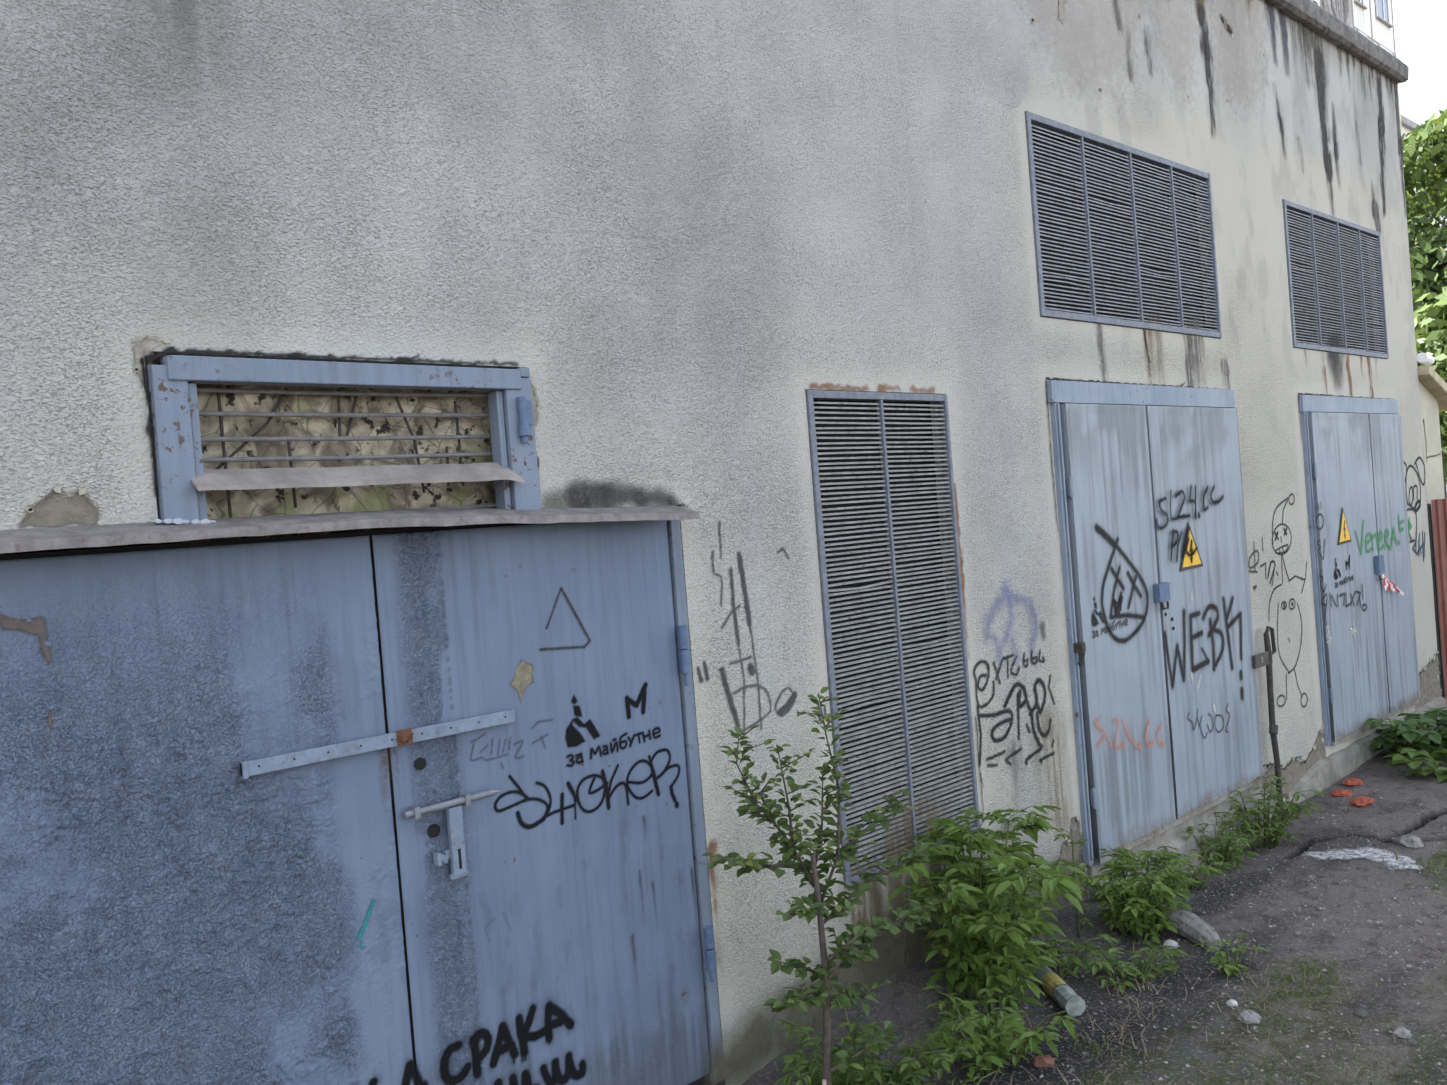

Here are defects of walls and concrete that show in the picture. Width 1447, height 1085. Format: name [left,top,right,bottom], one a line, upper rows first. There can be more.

leakage [1114,0,1152,79]
leakage [1197,0,1215,135]
leakage [1266,2,1406,232]
leakage [1186,321,1202,388]
leakage [1328,336,1341,378]
spalling [19,487,104,528]
peeling [0,614,52,663]